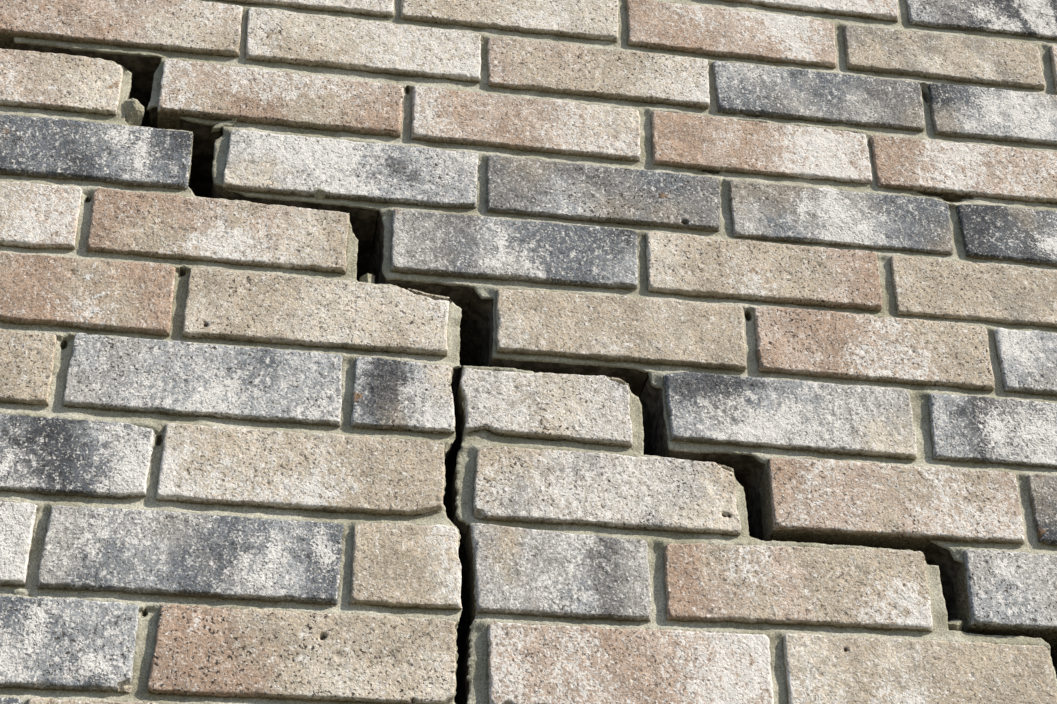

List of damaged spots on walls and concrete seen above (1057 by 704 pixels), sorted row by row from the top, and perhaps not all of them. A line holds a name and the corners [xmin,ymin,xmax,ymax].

crack [16,43,772,704]
crack [917,543,962,621]
crack [1049,645,1057,678]